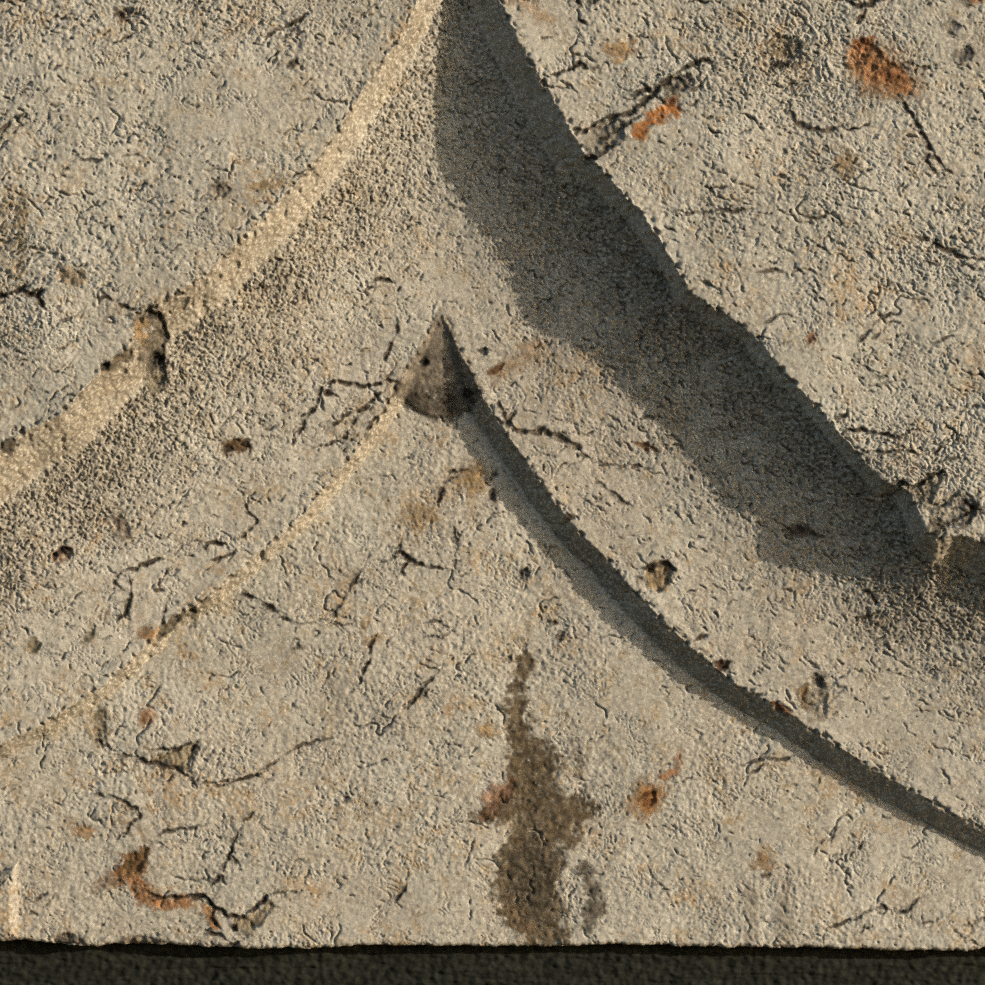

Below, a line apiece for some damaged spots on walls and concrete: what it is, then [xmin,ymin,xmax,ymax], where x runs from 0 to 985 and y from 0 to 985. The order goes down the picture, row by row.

crack [573,57,711,157]
rust [632,95,681,141]
rust [847,36,918,96]
crack [902,101,952,174]
crack [0,284,72,322]
spalling [101,306,170,393]
crack [292,323,399,450]
crack [96,738,331,787]
water stain [470,650,608,945]
rust [636,756,680,814]
rust [101,847,219,930]
crack [145,812,298,946]